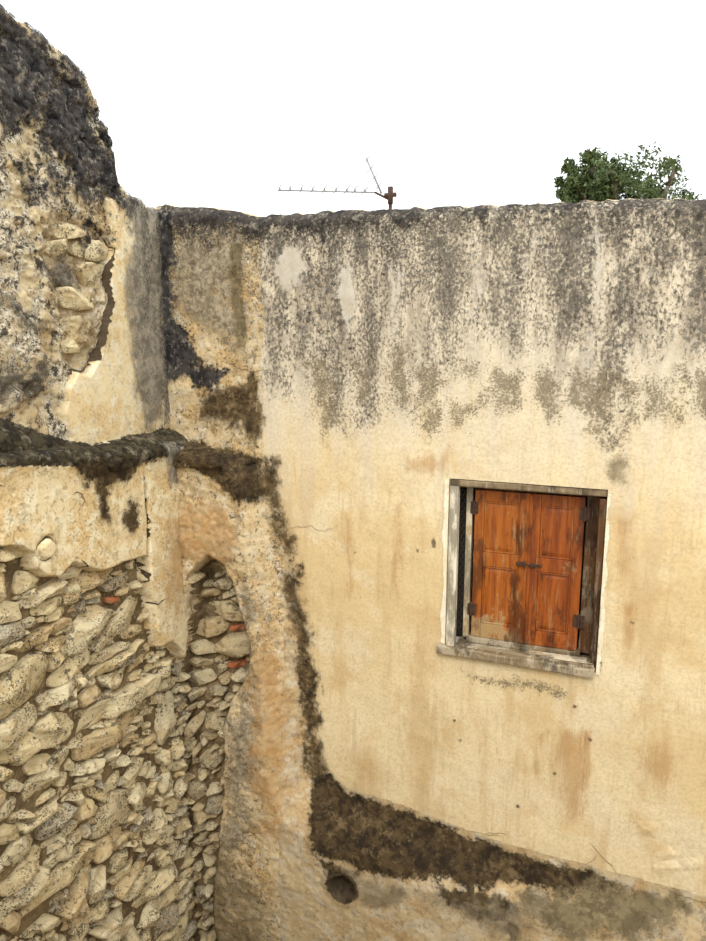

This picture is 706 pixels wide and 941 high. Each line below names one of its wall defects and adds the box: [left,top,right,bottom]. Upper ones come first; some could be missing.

spalling [44,222,108,353]
crack [67,218,116,376]
leakage [121,194,706,487]
leakage [80,464,140,533]
leakage [314,855,360,877]
leakage [436,882,519,921]
peeling [501,923,517,941]